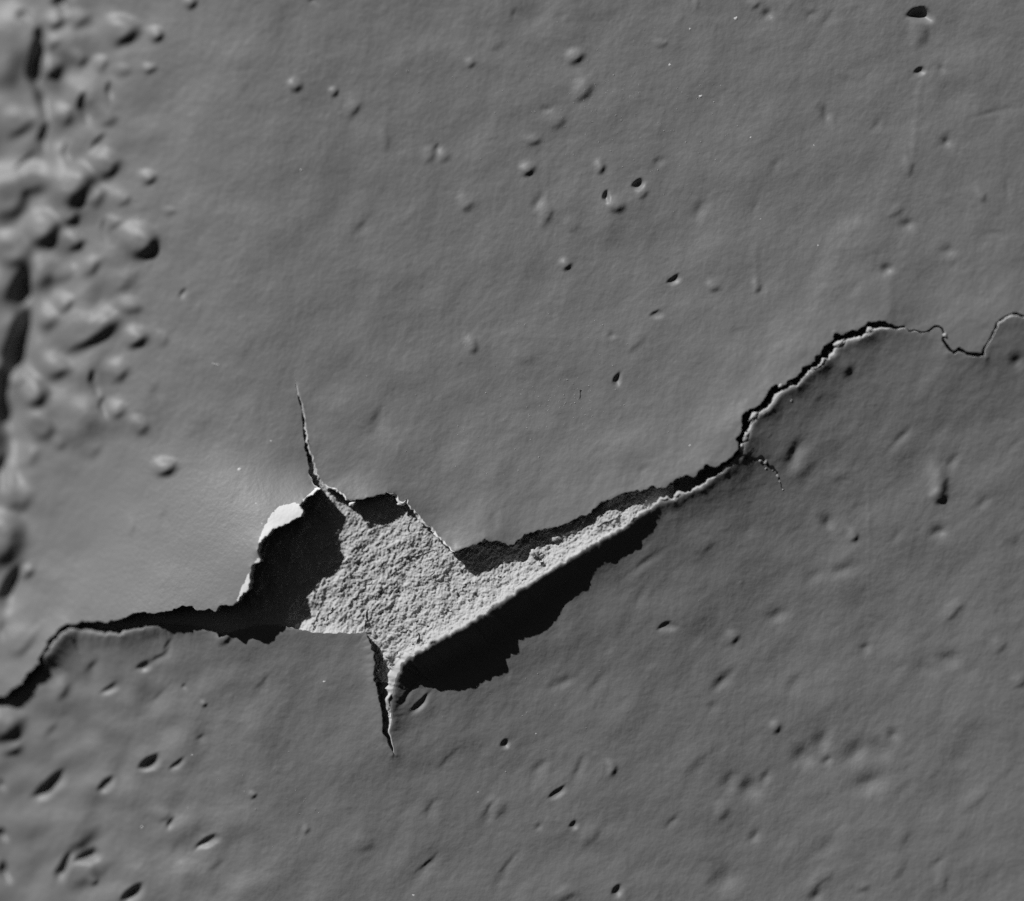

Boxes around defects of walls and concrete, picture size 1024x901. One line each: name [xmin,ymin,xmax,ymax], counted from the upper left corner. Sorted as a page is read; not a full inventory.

crack [296,387,313,463]
crack [674,312,1024,494]
flaking render [0,312,1024,756]
crack [313,548,435,643]
crack [0,605,228,703]